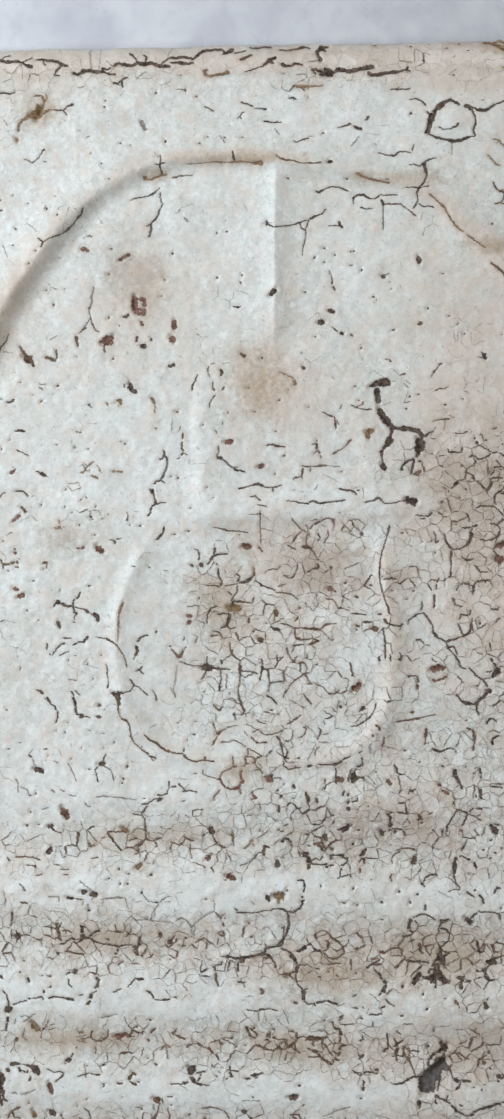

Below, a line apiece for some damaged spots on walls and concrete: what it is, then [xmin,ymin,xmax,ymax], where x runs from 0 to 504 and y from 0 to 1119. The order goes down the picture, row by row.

crack [483,39,504,68]
crack [0,46,504,276]
crack [50,287,99,346]
crack [0,362,504,1119]
spalling [417,1040,449,1109]